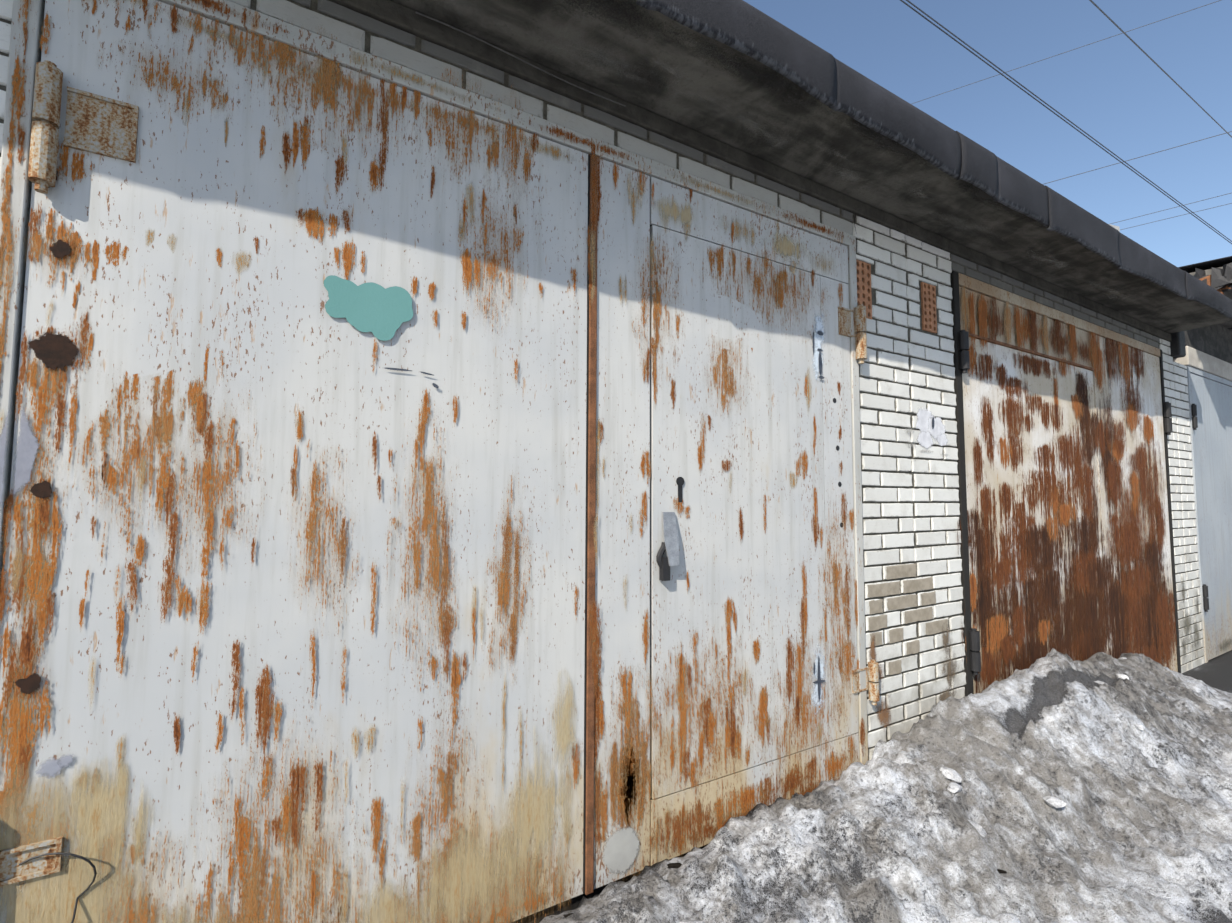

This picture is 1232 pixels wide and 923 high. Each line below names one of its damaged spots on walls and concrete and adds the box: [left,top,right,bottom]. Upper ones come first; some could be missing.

rust [0,0,865,923]
rust [957,287,1180,693]